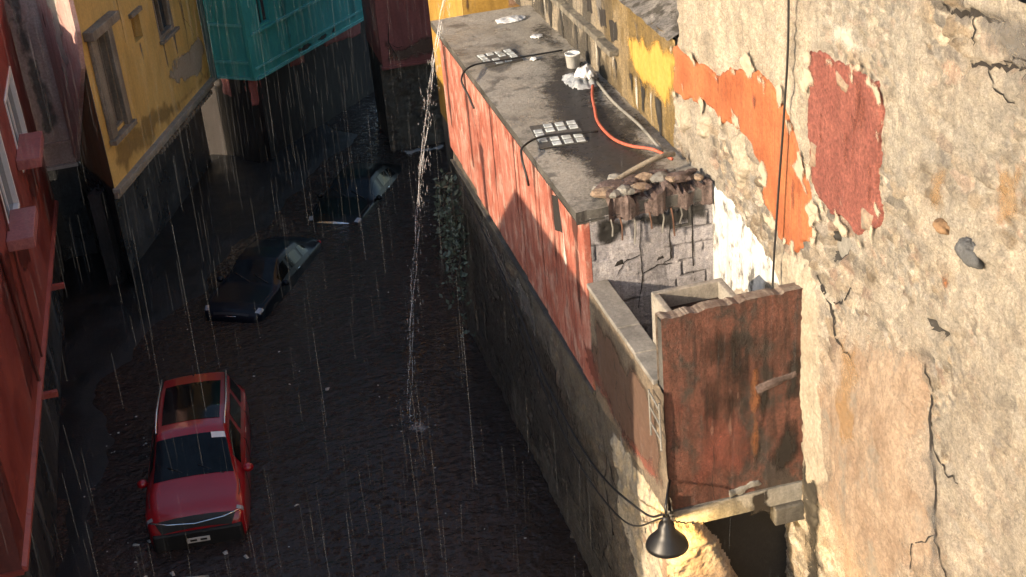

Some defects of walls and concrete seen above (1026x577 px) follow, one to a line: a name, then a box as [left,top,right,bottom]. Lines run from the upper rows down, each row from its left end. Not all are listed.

crack [942,3,1026,104]
flaking render [587,0,885,263]
crack [618,205,695,308]
spalling [590,151,780,292]
rust [751,370,759,412]
crack [910,368,958,577]